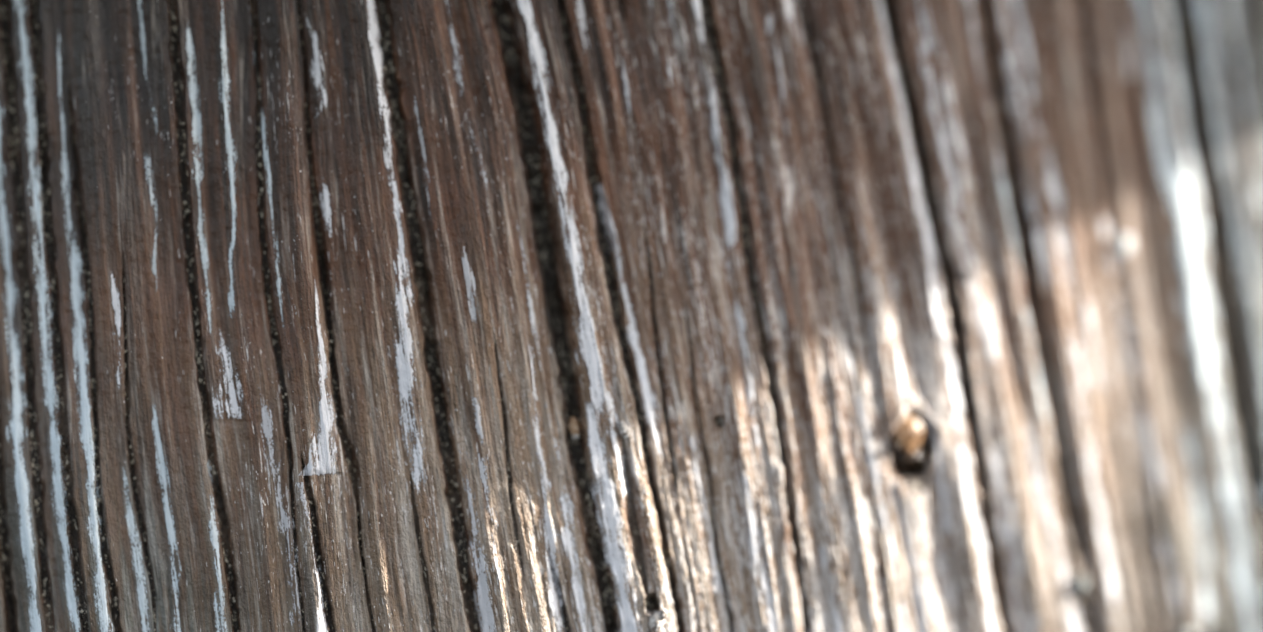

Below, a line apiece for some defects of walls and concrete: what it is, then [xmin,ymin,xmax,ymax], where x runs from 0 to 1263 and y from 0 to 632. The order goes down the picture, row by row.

crack [374,0,481,632]
crack [490,0,619,632]
crack [556,0,734,632]
crack [882,0,1011,632]
crack [1170,0,1259,561]